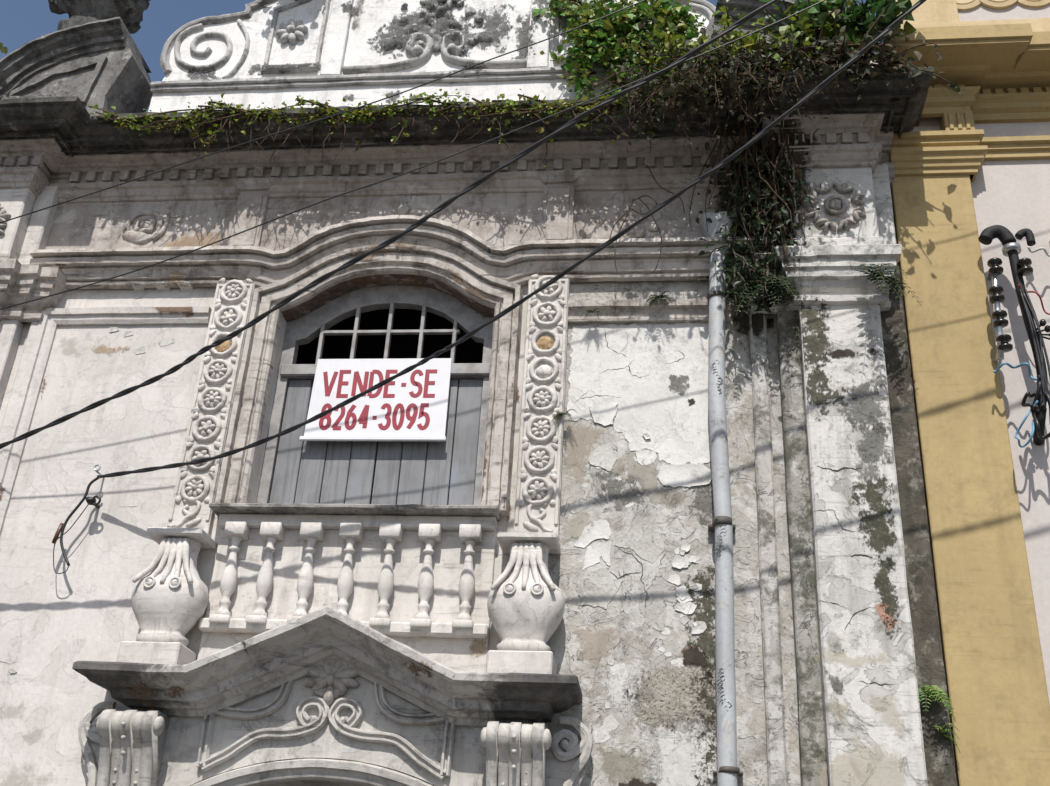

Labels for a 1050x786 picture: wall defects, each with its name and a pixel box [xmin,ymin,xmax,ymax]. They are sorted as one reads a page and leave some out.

crack [576,288,684,402]
damp [836,363,894,483]
peeling [563,321,732,744]